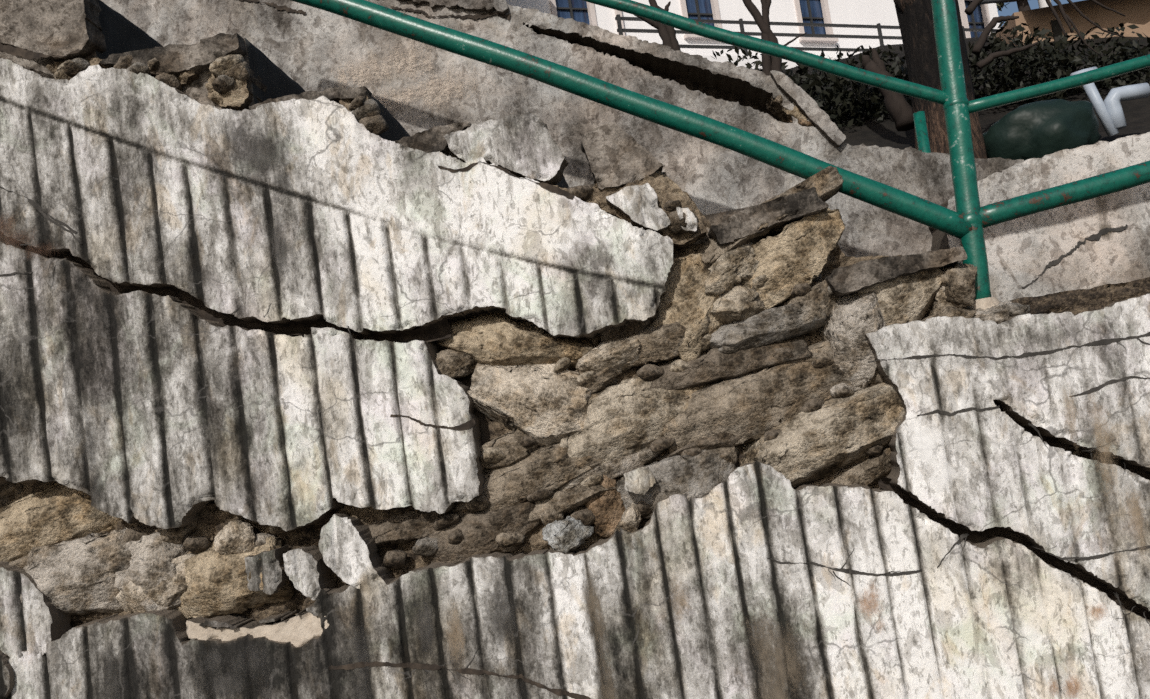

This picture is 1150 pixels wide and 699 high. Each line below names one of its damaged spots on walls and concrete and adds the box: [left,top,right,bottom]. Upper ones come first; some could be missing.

crack [391,6,510,20]
spalling [46,54,267,110]
crack [632,65,816,127]
crack [0,186,452,351]
spalling [0,166,977,699]
crack [917,401,1150,480]
crack [766,477,1150,626]